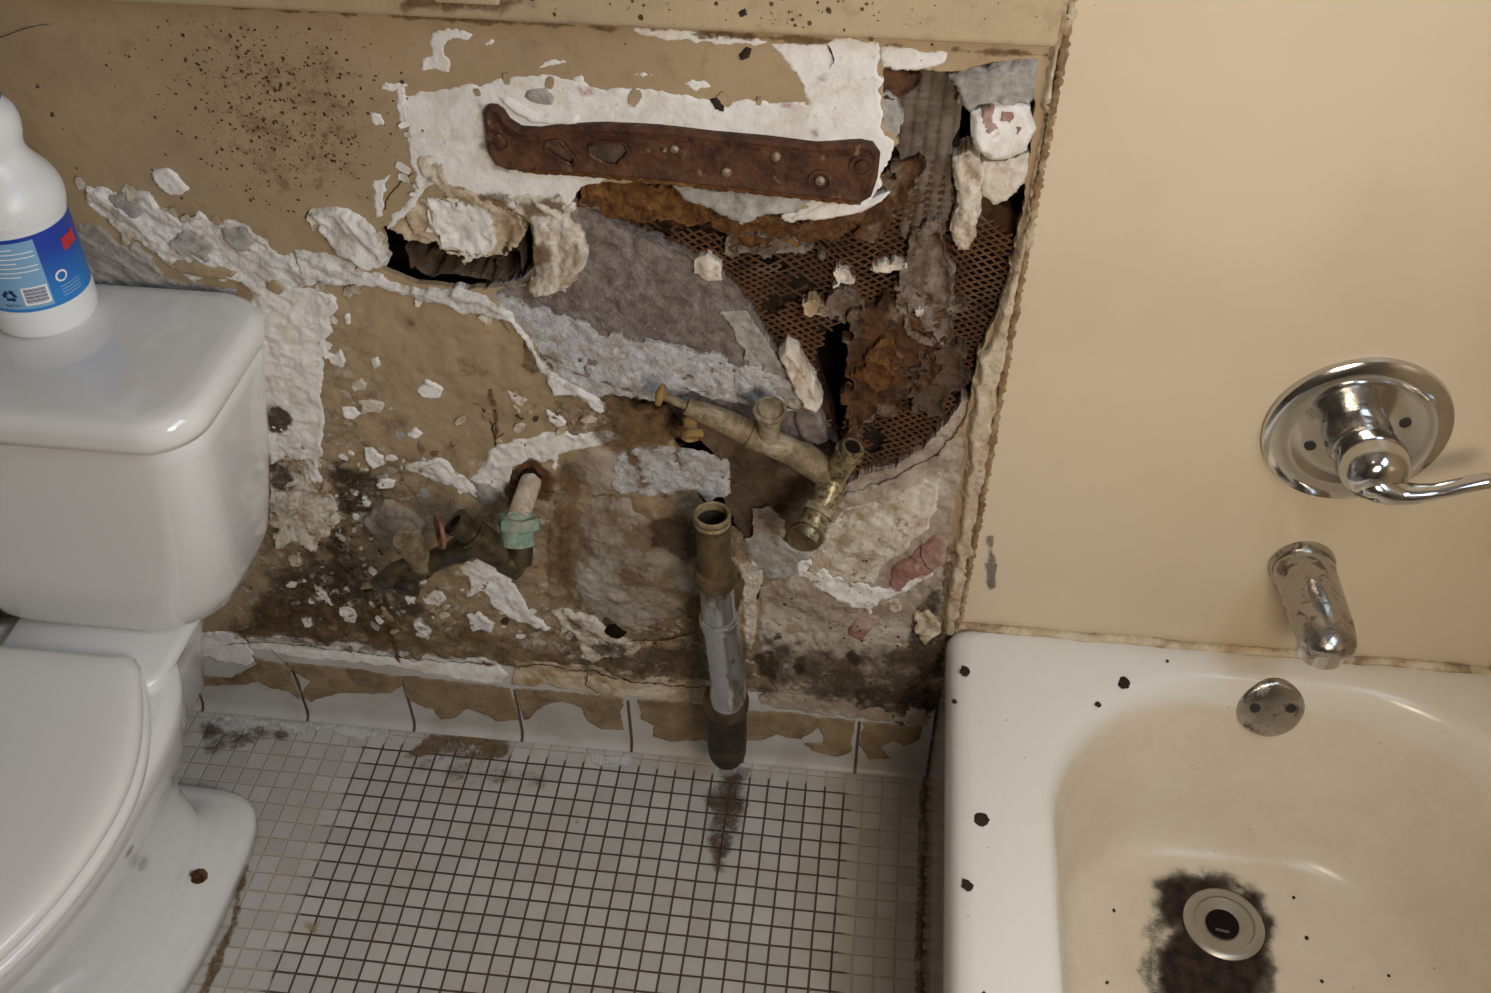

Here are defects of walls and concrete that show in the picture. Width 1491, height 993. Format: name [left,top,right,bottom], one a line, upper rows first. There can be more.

mould [105,20,424,215]
rust [577,151,927,247]
spalling [948,59,1038,250]
peeling [75,28,971,760]
rust [840,287,946,442]
leakage [231,460,562,665]
leakage [557,466,584,603]
leakage [570,596,708,681]
leakage [651,514,698,559]
leakage [741,573,945,729]
leakage [409,735,508,760]
leakage [706,770,747,870]